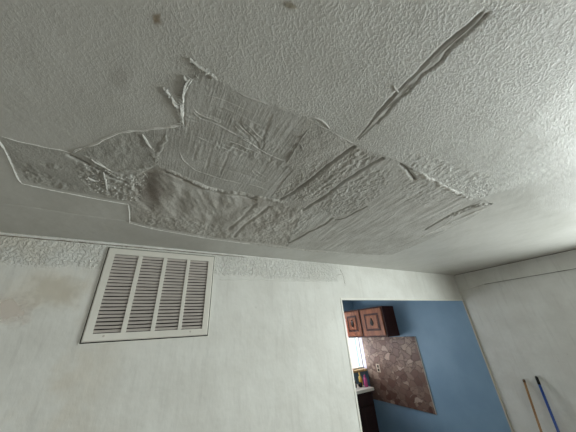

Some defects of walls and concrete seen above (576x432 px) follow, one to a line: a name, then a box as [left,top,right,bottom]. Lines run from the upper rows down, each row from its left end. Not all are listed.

spalling [0,58,356,224]
crack [285,11,488,210]
flaking render [288,155,493,256]
crack [422,202,493,237]